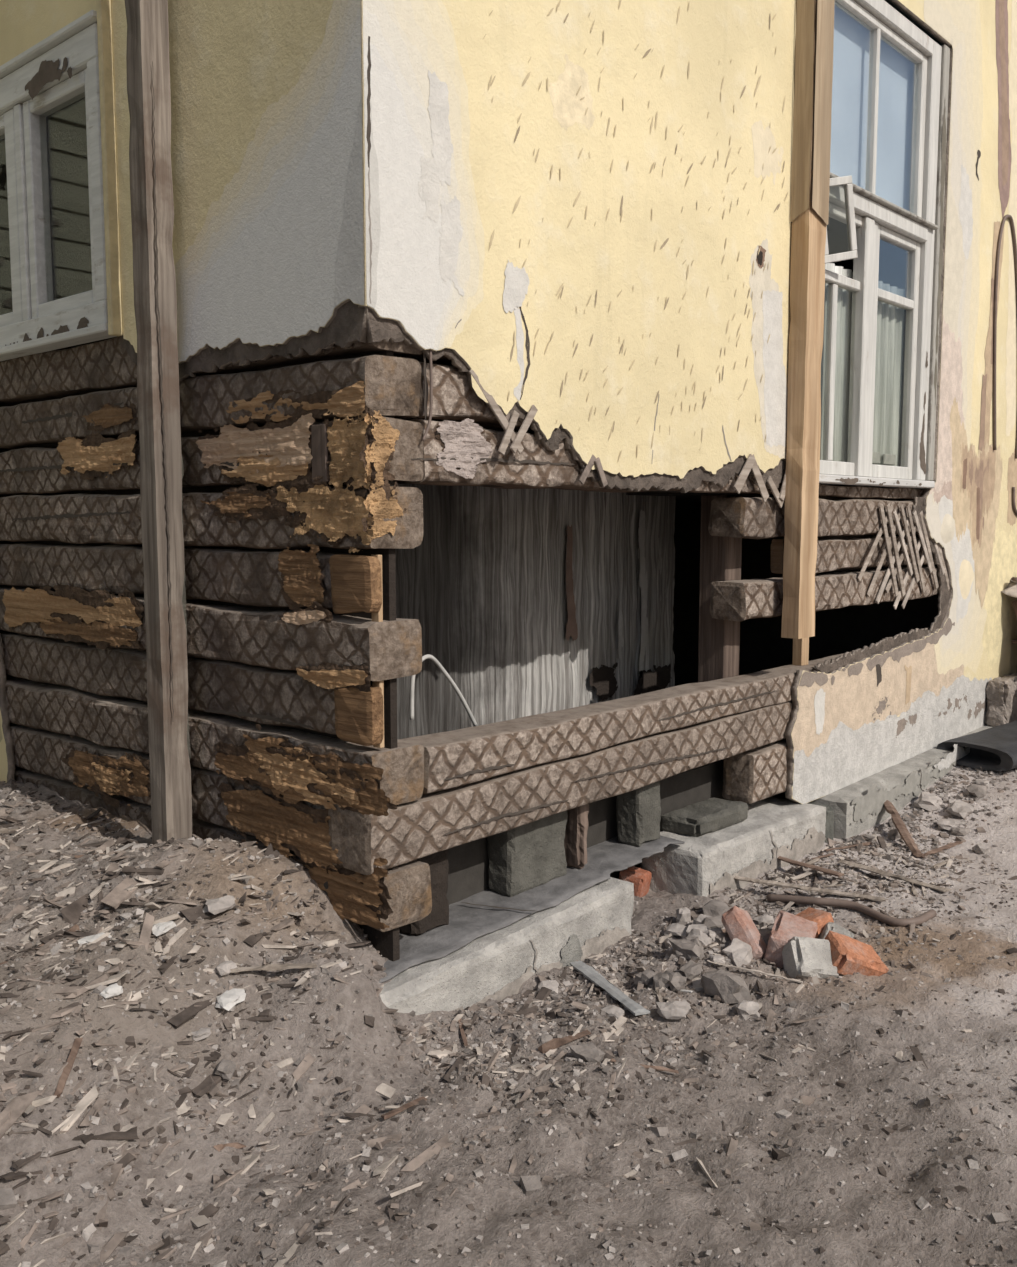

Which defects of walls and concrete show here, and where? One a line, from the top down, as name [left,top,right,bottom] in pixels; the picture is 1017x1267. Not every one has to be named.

peeling [25,57,72,100]
crack [365,36,373,303]
peeling [5,317,89,346]
water stain [950,0,1017,609]
spalling [503,260,786,493]
spalling [436,418,493,479]
spalling [195,381,407,625]
spalling [296,662,371,692]
spalling [589,663,618,700]
spalling [633,664,672,696]
spalling [214,724,397,938]